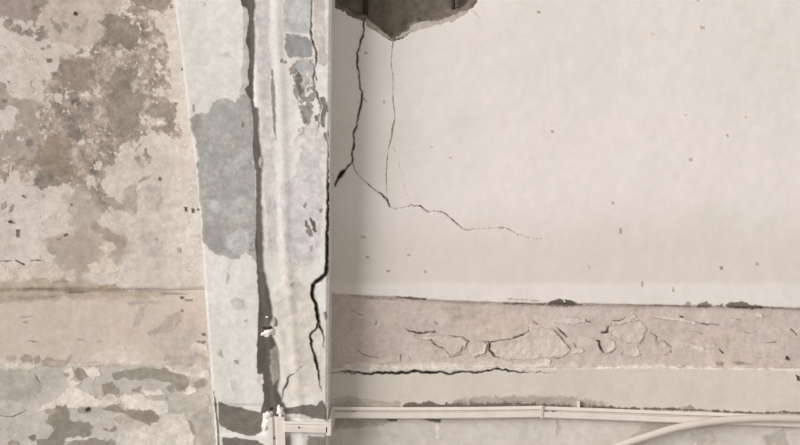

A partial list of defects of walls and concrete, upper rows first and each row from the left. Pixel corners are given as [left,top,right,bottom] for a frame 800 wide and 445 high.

water stain [0,0,183,326]
peeling [0,0,477,445]
crack [282,1,576,398]
flaking render [343,316,585,371]
crack [586,317,672,354]
flaking render [596,314,800,381]